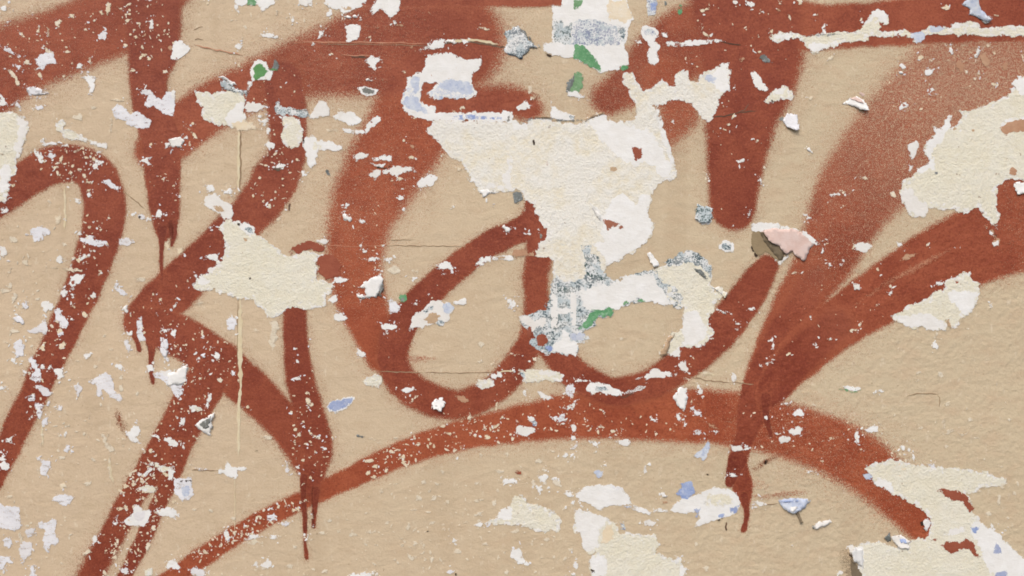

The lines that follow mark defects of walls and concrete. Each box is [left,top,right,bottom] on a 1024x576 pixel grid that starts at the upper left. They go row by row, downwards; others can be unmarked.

peeling [0,0,190,213]
peeling [0,184,418,576]
peeling [293,0,1024,576]